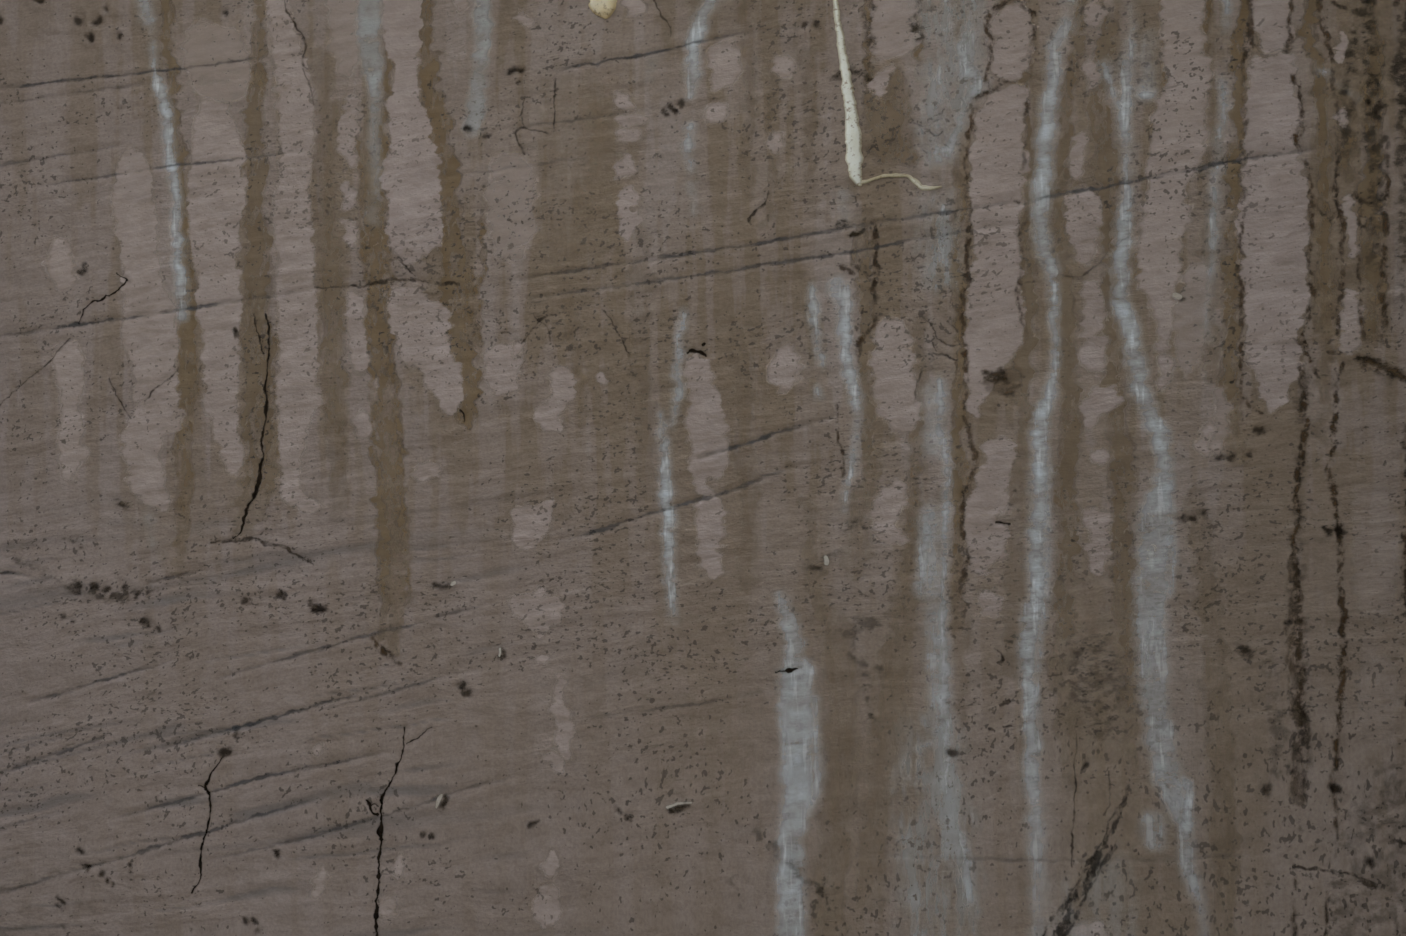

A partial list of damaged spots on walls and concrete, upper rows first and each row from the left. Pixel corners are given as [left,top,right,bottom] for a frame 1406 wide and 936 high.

leakage [153,0,200,520]
leakage [238,0,282,505]
crack [211,313,313,564]
leakage [355,0,411,607]
leakage [417,0,493,430]
leakage [660,425,675,607]
leakage [862,4,982,901]
leakage [1012,0,1196,888]
leakage [1202,0,1250,440]
crack [191,757,223,893]
crack [366,727,433,936]
leakage [778,610,818,936]